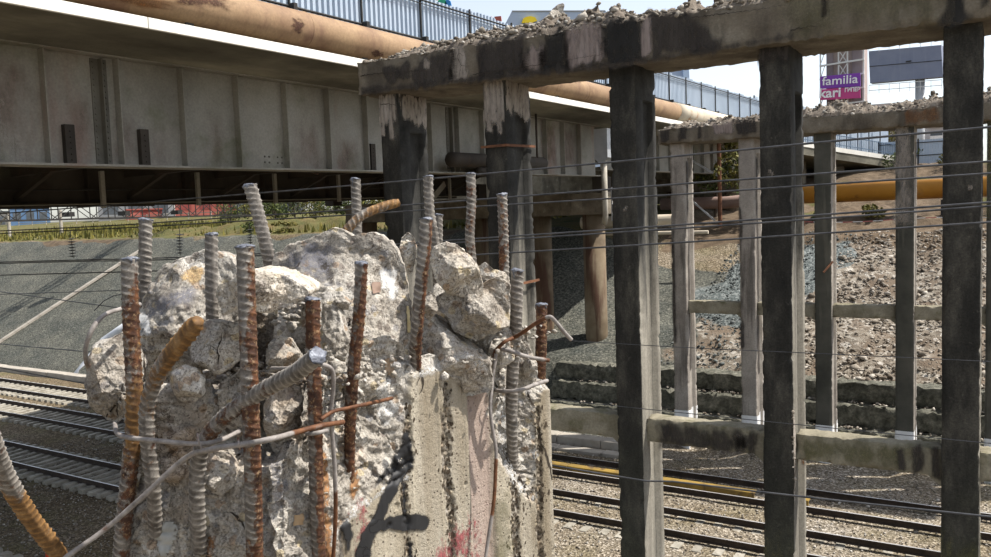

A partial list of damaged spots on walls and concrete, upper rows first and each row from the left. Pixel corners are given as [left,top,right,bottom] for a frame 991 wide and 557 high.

water stain [937,0,970,28]
water stain [683,36,789,65]
water stain [361,17,670,139]
rust [181,266,203,284]
spalling [414,351,487,377]
spalling [495,399,523,492]
water stain [898,444,941,480]
rust [323,452,332,557]